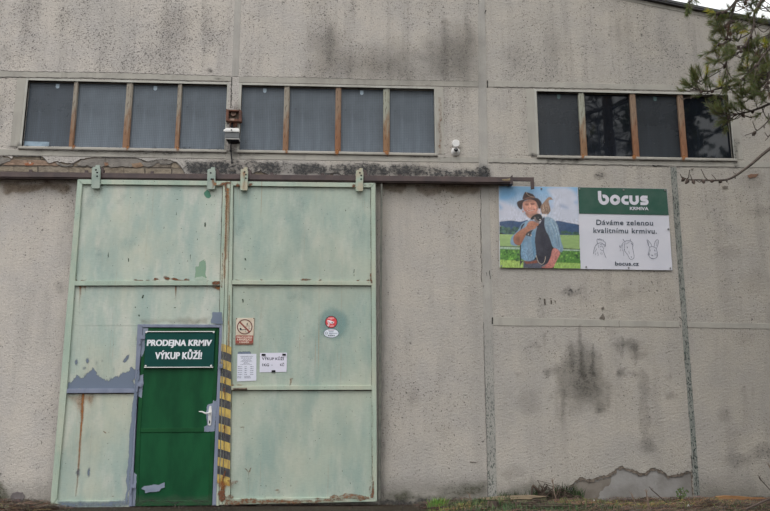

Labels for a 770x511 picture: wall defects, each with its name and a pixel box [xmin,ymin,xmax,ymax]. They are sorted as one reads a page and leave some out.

spalling [0,155,185,174]
damp [185,149,490,177]
corrosion [212,180,252,272]
peeling [134,255,207,281]
corrosion [218,471,374,505]
spalling [568,466,694,500]